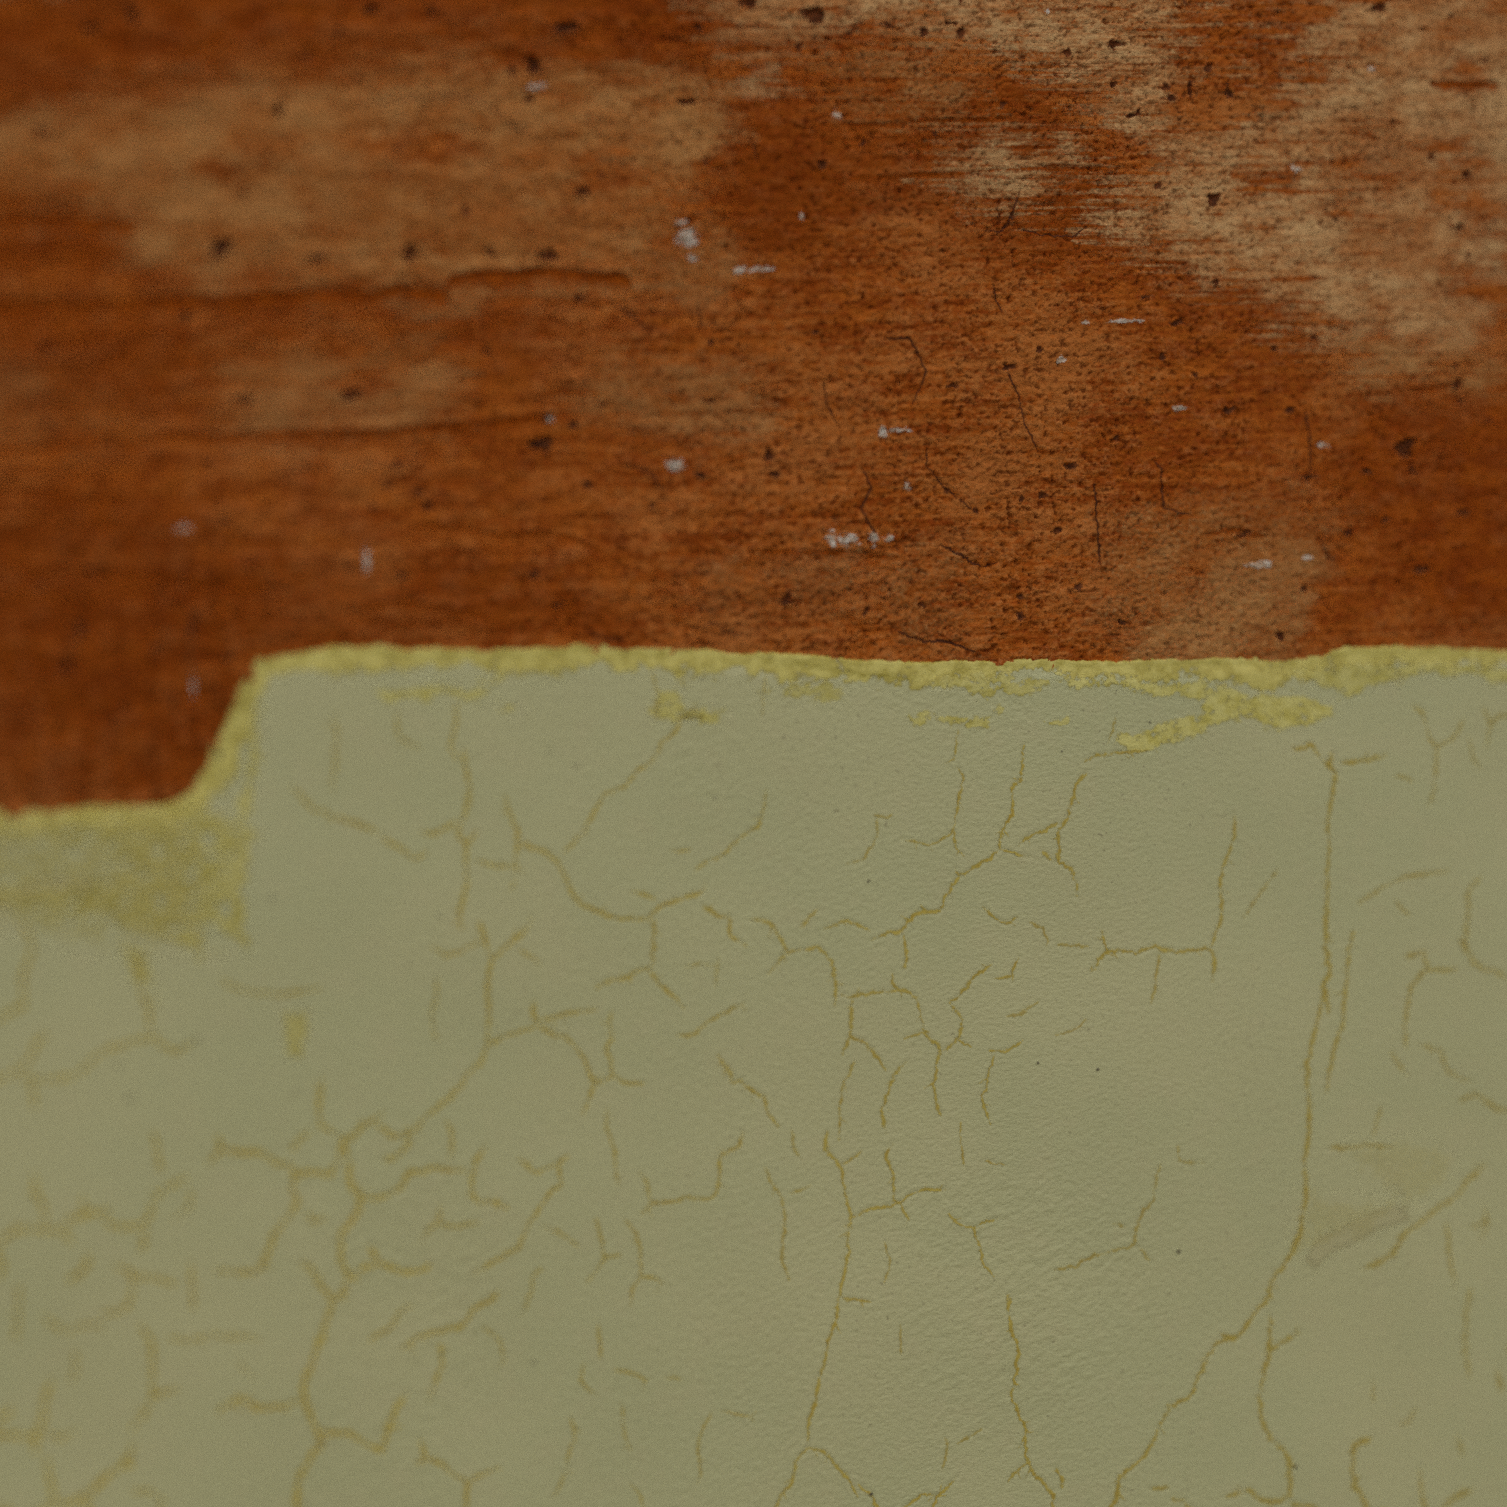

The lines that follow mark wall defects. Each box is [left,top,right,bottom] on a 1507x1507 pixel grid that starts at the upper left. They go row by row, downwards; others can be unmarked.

spalling [738,0,758,9]
spalling [800,7,825,24]
spalling [919,21,966,39]
spalling [1161,65,1212,101]
spalling [1429,82,1499,92]
spalling [1207,193,1222,207]
spalling [528,413,579,454]
spalling [1394,435,1416,475]
crack [1403,878,1505,1043]
crack [219,673,1237,1507]
crack [1109,743,1391,1507]
crack [1366,1164,1484,1269]